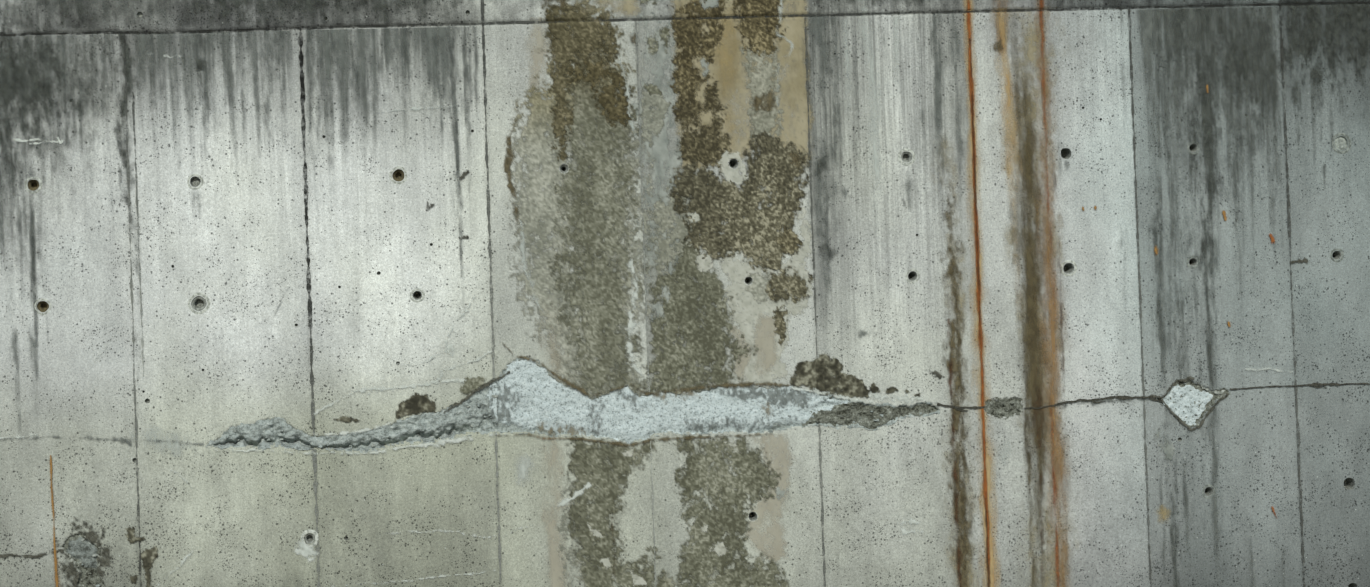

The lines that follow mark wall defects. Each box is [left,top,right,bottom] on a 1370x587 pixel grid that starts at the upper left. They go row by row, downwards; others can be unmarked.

water stain [104,0,477,202]
water stain [504,0,656,399]
spalling [206,0,940,587]
corrosion [965,0,996,587]
crack [937,402,985,411]
corrosion [1044,205,1067,587]
crack [1024,395,1163,409]
spalling [1151,376,1230,431]
corrosion [50,455,58,587]
spalling [55,519,112,587]
peeling [125,527,158,587]
water stain [548,436,661,587]